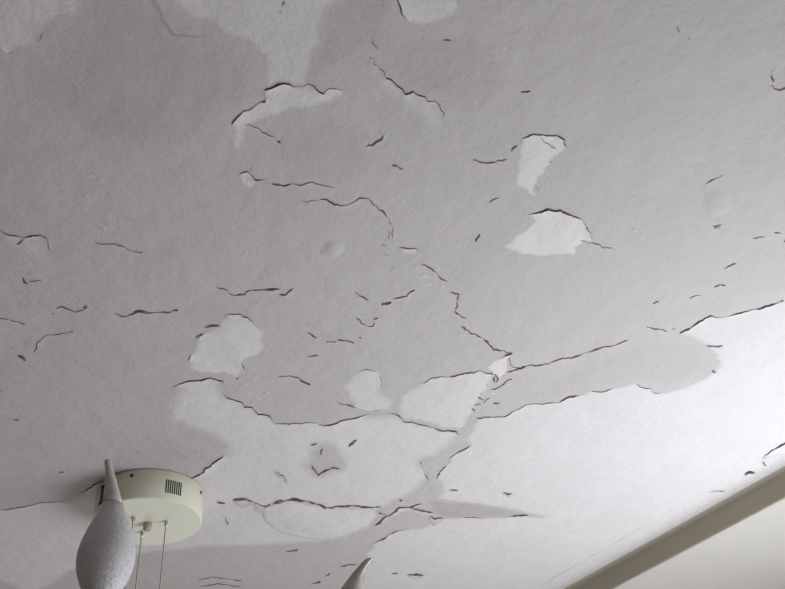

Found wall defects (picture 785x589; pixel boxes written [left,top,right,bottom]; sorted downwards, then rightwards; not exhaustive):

peeling [0,0,79,53]
peeling [397,0,457,26]
peeling [171,0,343,152]
crack [770,71,785,97]
peeling [516,134,566,196]
peeling [503,208,617,257]
crack [18,305,87,361]
crack [114,309,179,323]
crack [216,288,296,305]
peeling [135,292,785,589]
crack [217,472,444,527]
peeling [0,481,103,589]